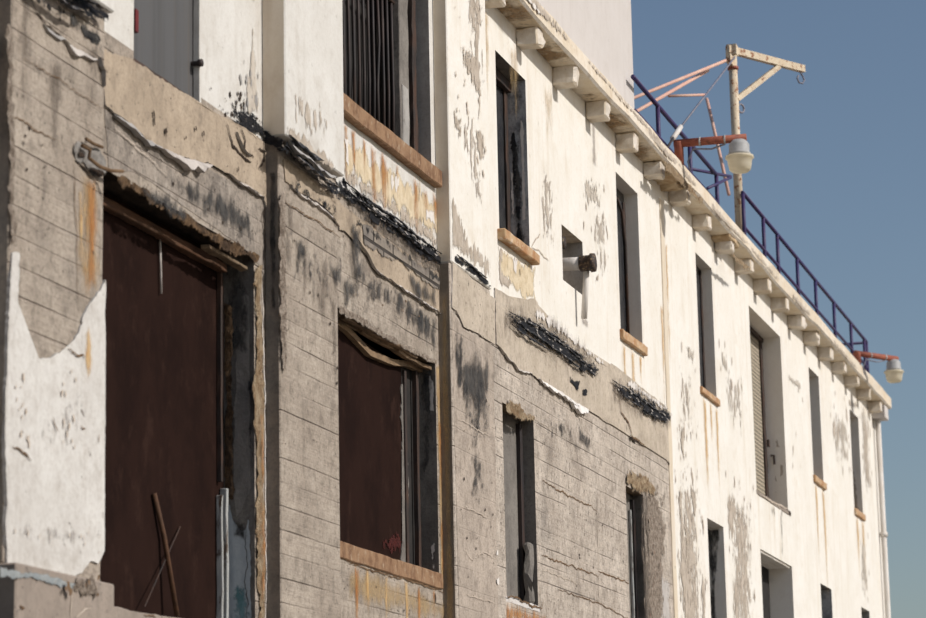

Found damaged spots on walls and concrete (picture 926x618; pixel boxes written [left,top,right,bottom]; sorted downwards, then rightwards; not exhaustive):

peeling [454,0,486,204]
flaking render [0,24,106,618]
rust [73,154,102,305]
flaking render [74,49,267,618]
spalling [278,193,288,371]
rust [344,128,437,233]
water stain [345,226,436,345]
water stain [460,351,488,502]
spalling [283,121,708,618]
crack [618,394,644,445]
crack [543,480,629,618]
peeling [727,485,756,618]